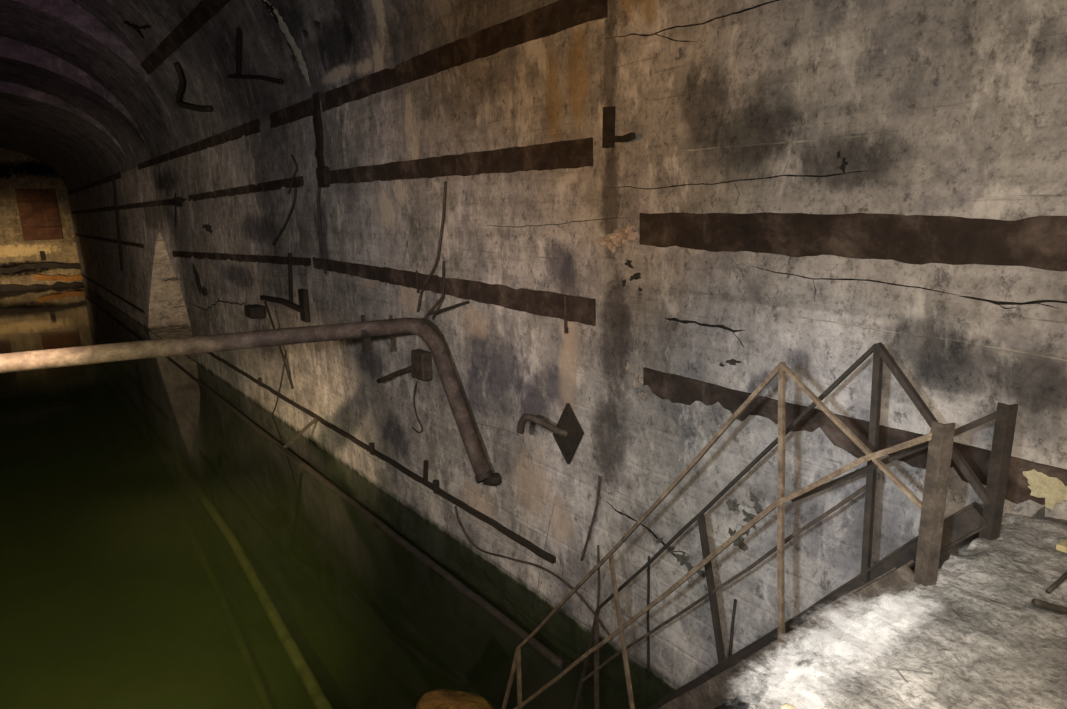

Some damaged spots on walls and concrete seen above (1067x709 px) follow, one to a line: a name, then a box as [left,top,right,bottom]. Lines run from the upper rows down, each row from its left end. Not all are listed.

crack [604,0,780,42]
crack [752,266,1067,309]
peeling [1023,469,1067,510]
spalling [1032,571,1067,613]